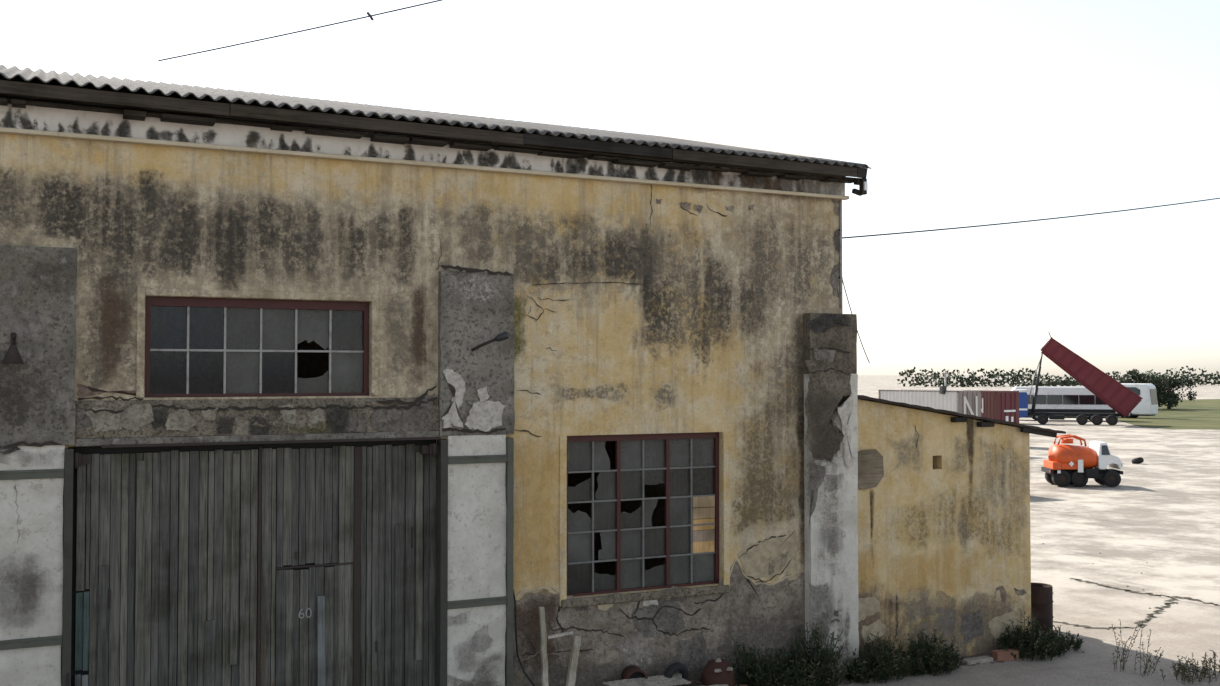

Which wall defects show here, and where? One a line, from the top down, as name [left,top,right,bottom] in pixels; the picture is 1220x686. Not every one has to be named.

damp [246,132,319,152]
damp [0,171,323,386]
damp [340,208,426,377]
flaking render [806,313,850,333]
flaking render [831,200,841,298]
peeling [343,369,505,433]
damp [733,323,805,556]
peeling [804,347,853,566]
damp [956,419,973,482]
crack [519,593,724,662]
flaking render [513,531,805,686]
crack [1053,578,1220,630]